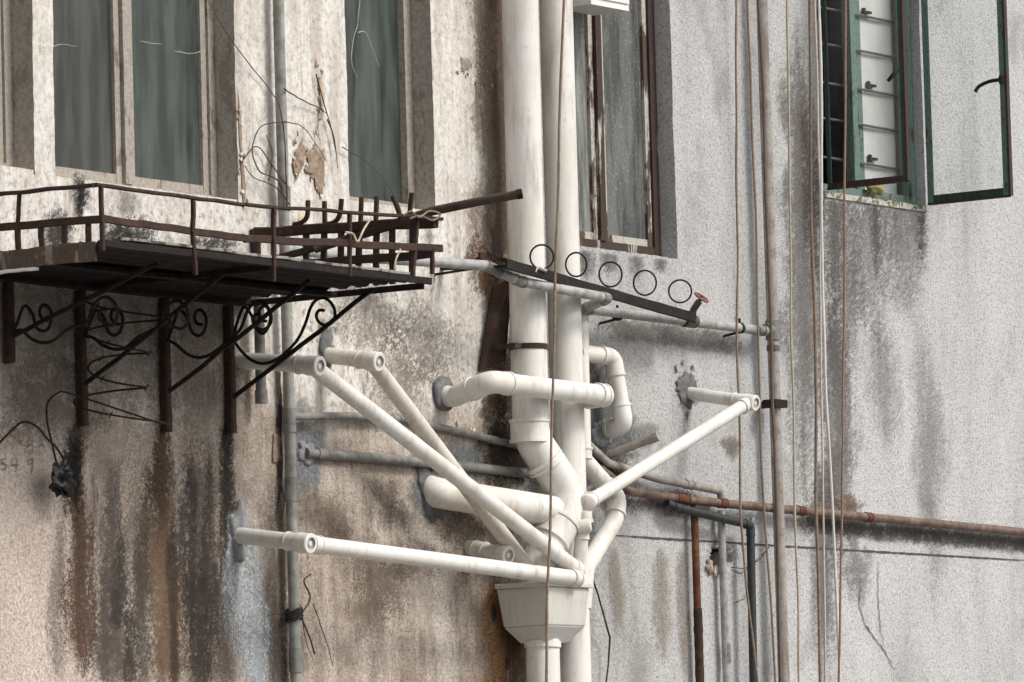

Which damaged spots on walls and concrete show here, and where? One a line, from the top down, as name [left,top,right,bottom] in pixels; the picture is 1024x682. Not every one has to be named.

peeling [293,59,326,197]
damp [464,0,508,309]
damp [870,204,882,274]
damp [918,213,928,266]
damp [119,415,139,533]
damp [219,425,236,567]
crack [859,580,895,671]